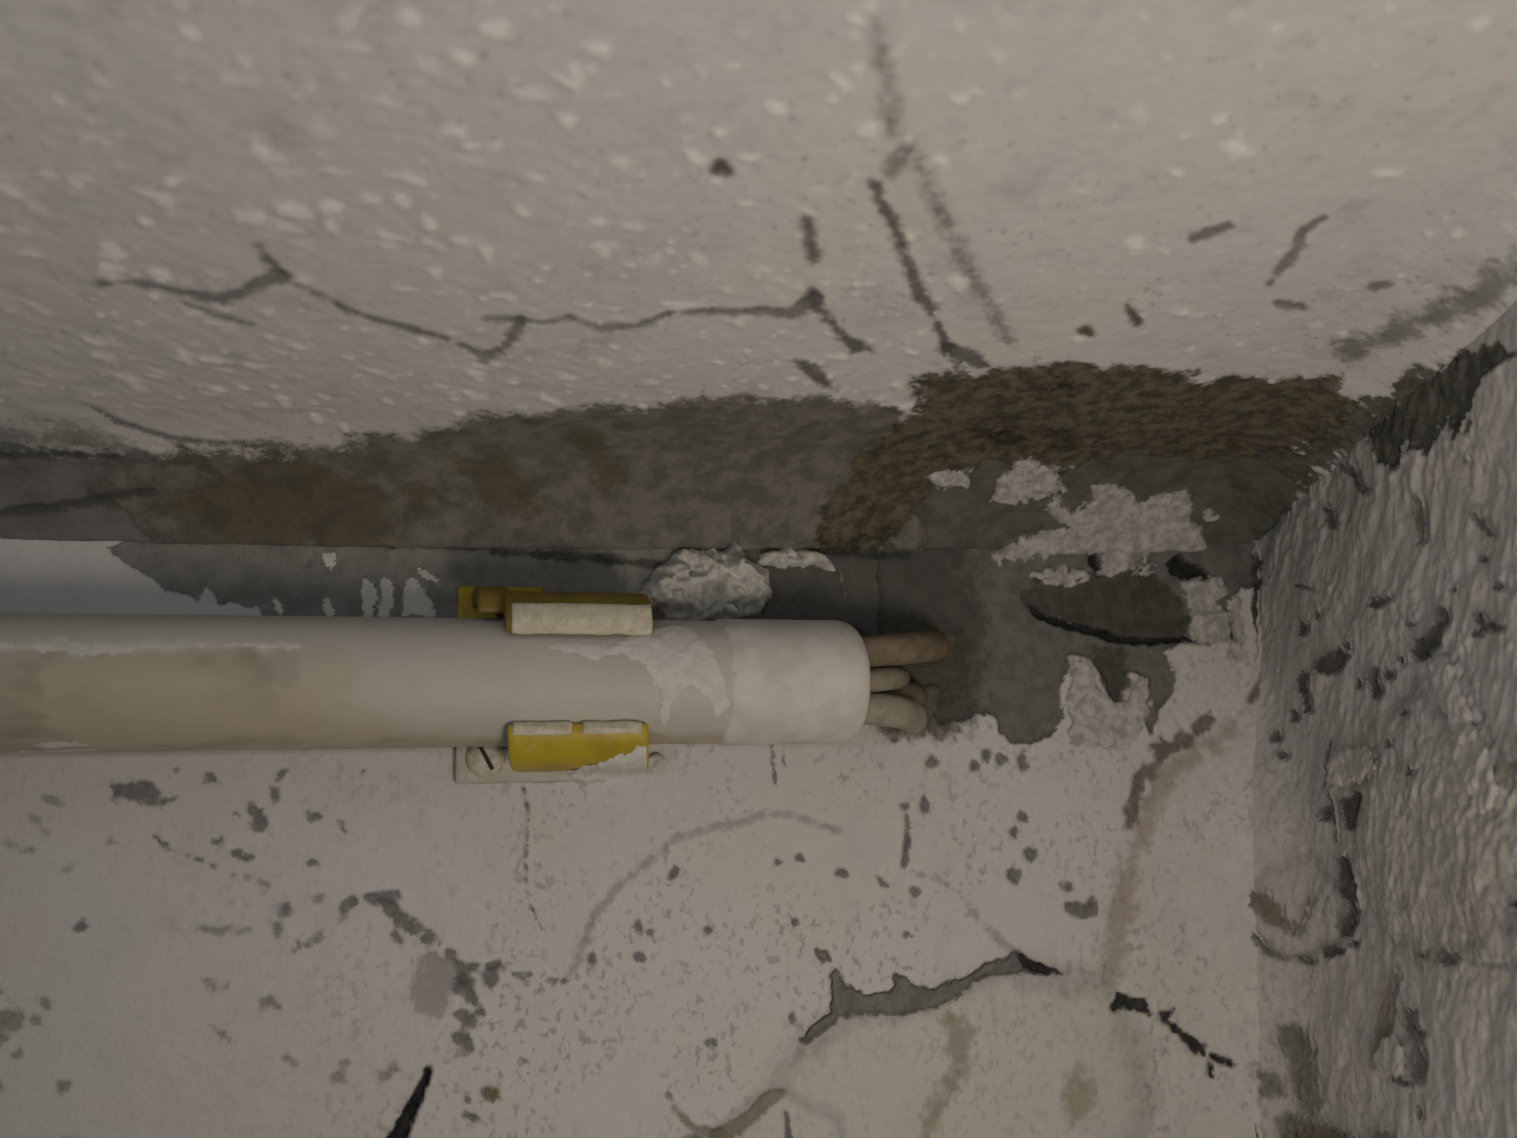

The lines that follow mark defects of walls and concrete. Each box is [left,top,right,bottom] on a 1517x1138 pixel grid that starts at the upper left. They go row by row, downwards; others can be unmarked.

crack [96,245,824,363]
water stain [0,182,1517,551]
peeling [107,540,696,618]
peeling [739,541,1263,772]
peeling [1269,641,1350,760]
peeling [1356,588,1502,816]
spalling [110,781,177,806]
peeling [1007,812,1037,885]
peeling [1060,883,1099,919]
crack [340,890,567,1138]
crack [1111,992,1236,1078]
crack [666,1090,793,1138]